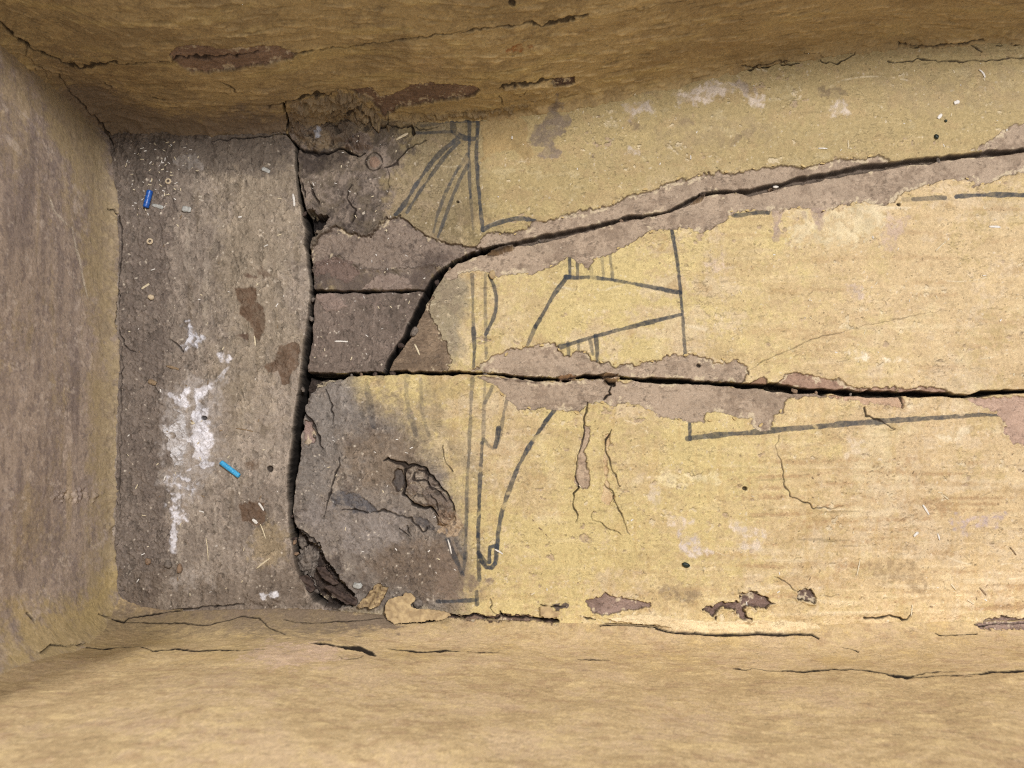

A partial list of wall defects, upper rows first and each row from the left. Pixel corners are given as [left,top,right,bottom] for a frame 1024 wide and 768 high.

peeling [170,44,296,72]
peeling [354,82,480,116]
peeling [311,123,1024,290]
peeling [316,293,348,311]
peeling [390,296,453,373]
leakage [154,319,237,554]
peeling [304,420,317,446]
crack [38,147,1024,680]
peeling [472,342,948,431]
peeling [968,395,1024,446]
spalling [298,529,355,606]
peeling [585,591,821,635]